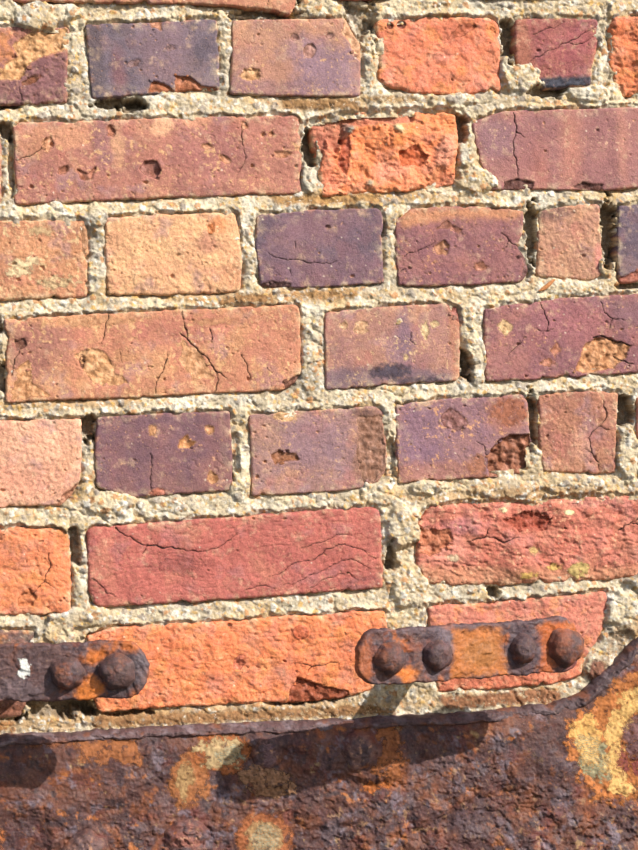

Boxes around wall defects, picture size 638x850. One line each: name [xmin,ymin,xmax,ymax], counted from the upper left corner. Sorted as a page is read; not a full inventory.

crack [181,311,225,390]
spalling [573,338,630,373]
spalling [485,434,530,476]
crack [116,528,236,552]
crack [248,534,367,589]
rust [93,705,395,729]
rust [441,688,561,709]
rust [31,739,143,767]
rust [165,734,297,811]
rust [363,726,410,794]
rust [562,672,638,808]
rust [234,813,295,850]